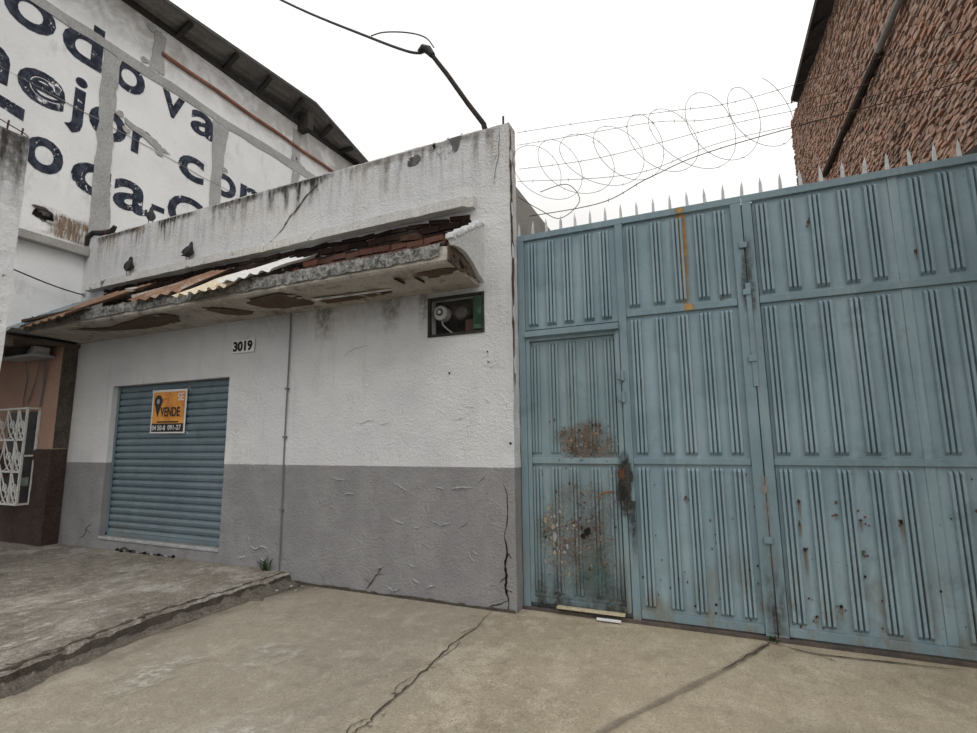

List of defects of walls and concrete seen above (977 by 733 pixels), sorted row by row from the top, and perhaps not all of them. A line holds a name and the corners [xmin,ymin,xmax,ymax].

leakage [99,226,144,241]
leakage [213,174,327,208]
flaking render [102,215,485,317]
crack [270,185,318,242]
rust [675,207,688,290]
spalling [73,315,181,332]
rust [549,417,619,470]
crack [346,473,512,733]